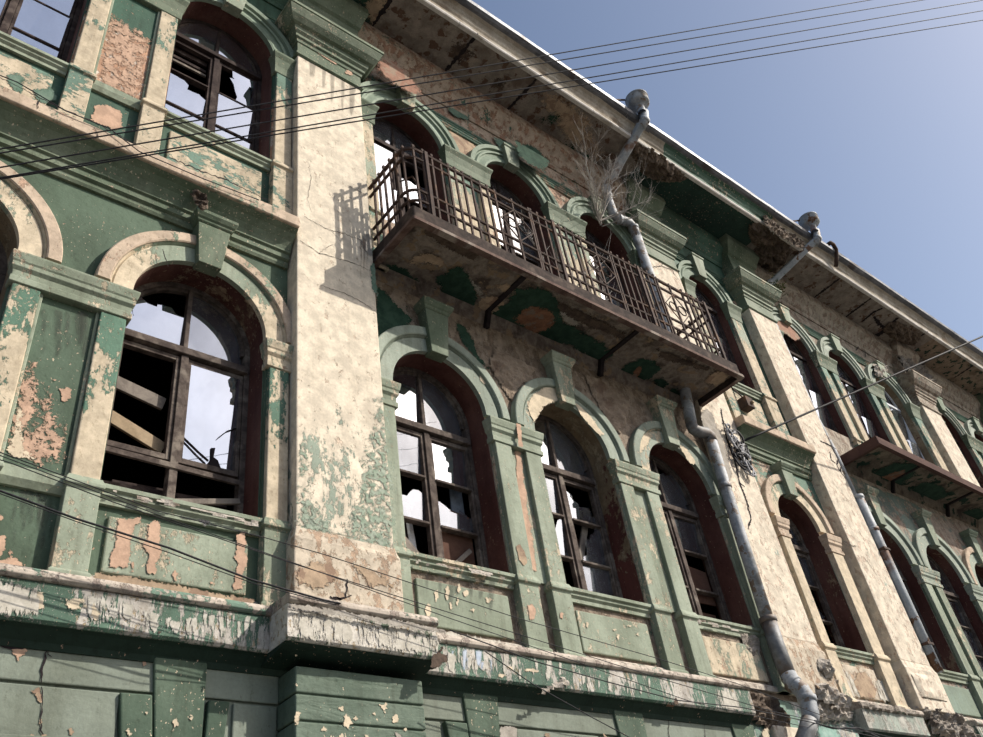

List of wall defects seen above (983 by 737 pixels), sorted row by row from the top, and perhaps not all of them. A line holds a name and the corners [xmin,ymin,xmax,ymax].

peeling [101,18,148,99]
spalling [90,104,123,129]
crack [303,163,368,270]
spalling [748,215,805,273]
peeling [370,253,613,361]
peeling [5,361,72,468]
peeling [293,392,405,554]
peeling [94,496,258,603]
peeling [65,598,100,620]
crack [1,646,52,735]
spalling [321,706,358,737]
flaking render [810,657,981,737]